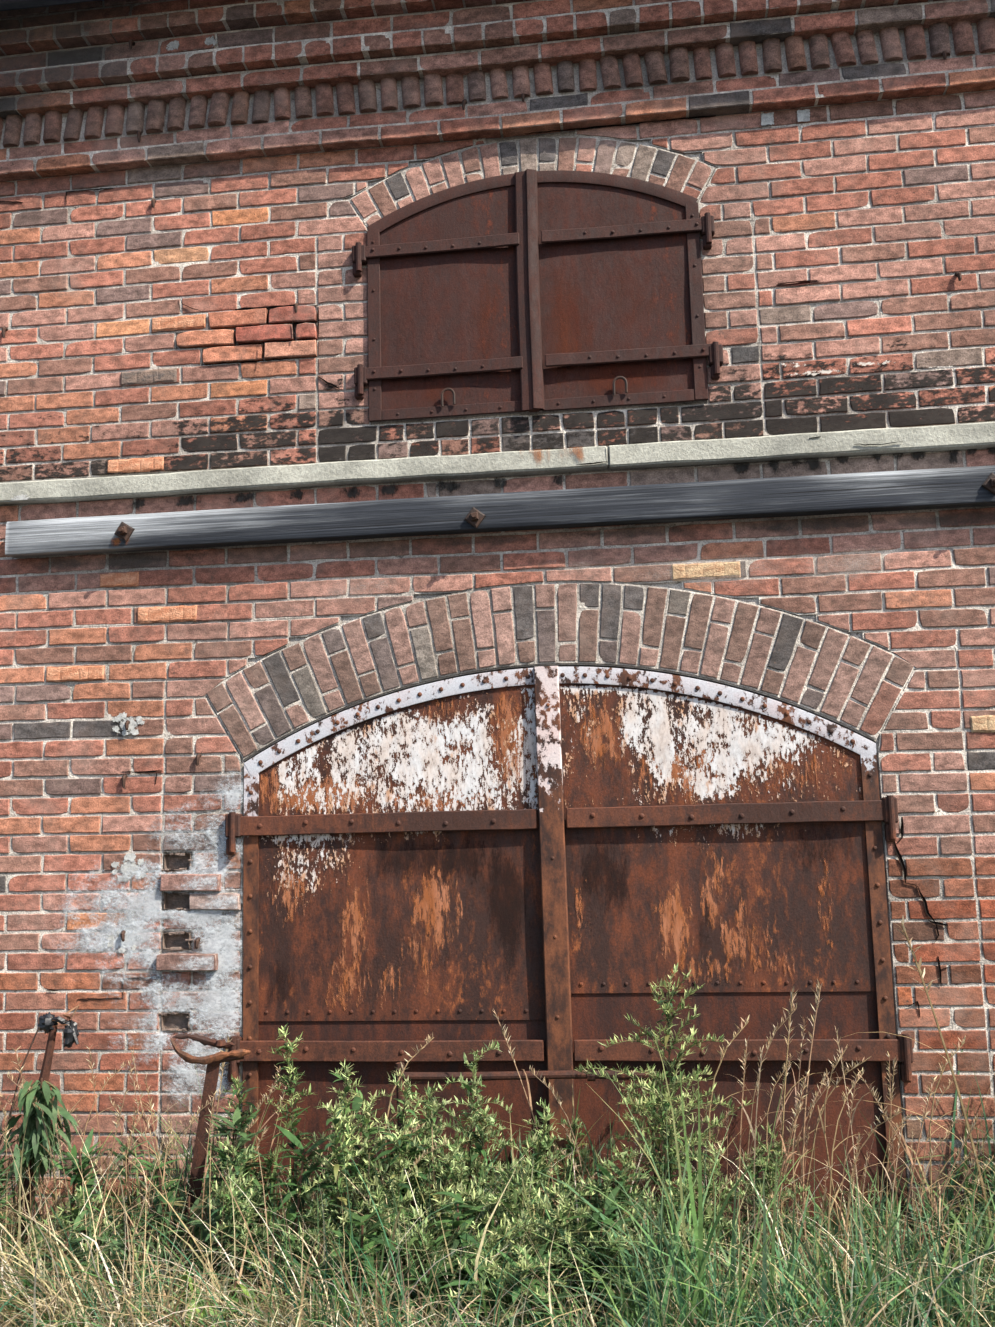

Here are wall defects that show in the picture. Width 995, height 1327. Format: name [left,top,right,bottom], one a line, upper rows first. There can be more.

corrosion [260,769,374,814]
peeling [273,687,538,816]
corrosion [573,700,749,802]
peeling [560,684,853,805]
spalling [161,853,193,872]
spalling [164,892,193,911]
spalling [163,931,194,951]
peeling [261,831,445,915]
corrosion [327,878,400,1010]
corrosion [401,867,463,991]
corrosion [656,853,795,982]
crack [894,817,948,1014]